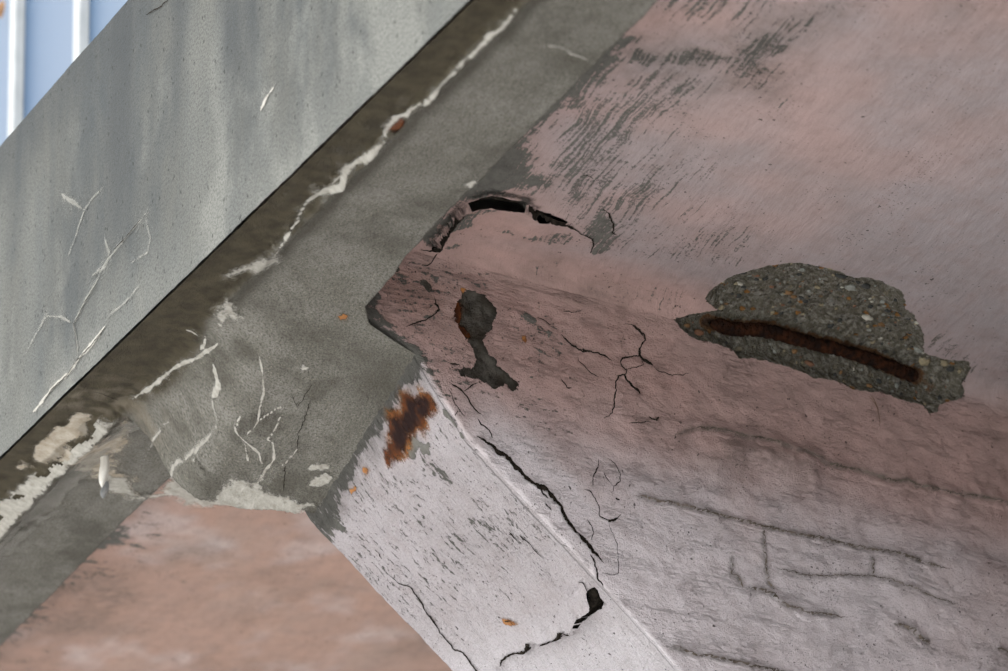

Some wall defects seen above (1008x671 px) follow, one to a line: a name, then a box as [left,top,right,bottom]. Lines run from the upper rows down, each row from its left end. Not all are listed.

damp [226,9,517,276]
crack [423,191,618,266]
crack [408,297,440,326]
flaking render [454,290,519,391]
crack [539,310,687,423]
spalling [674,263,971,413]
damp [308,463,333,487]
corrosion [383,387,436,466]
crack [449,363,621,588]